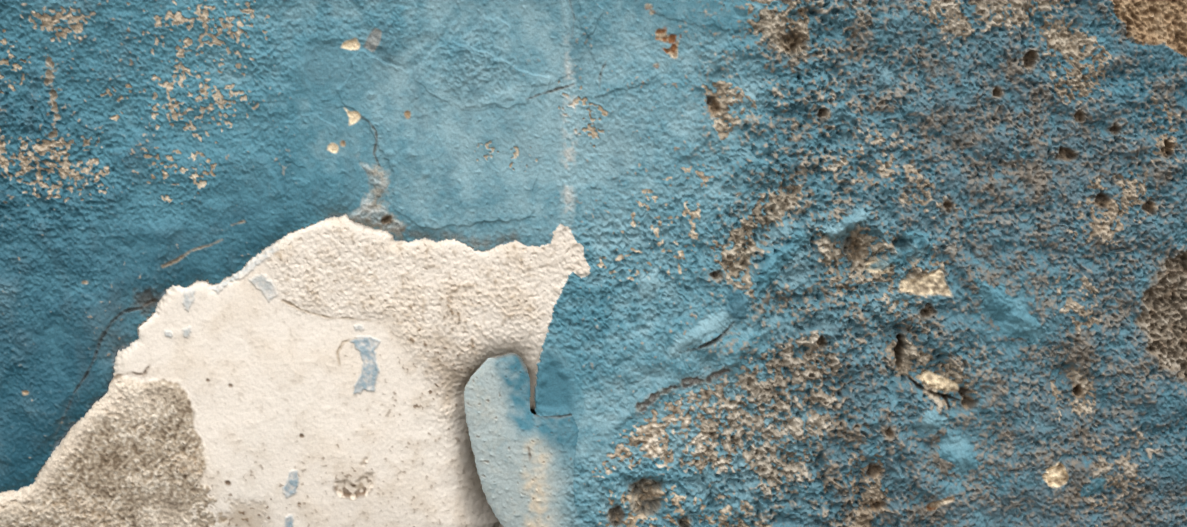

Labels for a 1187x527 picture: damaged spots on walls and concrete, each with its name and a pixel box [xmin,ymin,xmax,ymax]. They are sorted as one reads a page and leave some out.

spalling [1110,0,1187,58]
peeling [101,0,270,205]
peeling [0,128,114,211]
peeling [1067,97,1181,246]
crack [56,308,151,435]
flaking render [0,215,652,527]
peeling [592,331,843,527]
peeling [710,182,803,299]
peeling [814,222,952,316]
peeling [886,339,978,411]
spalling [1042,463,1070,488]
spalling [1134,250,1187,383]